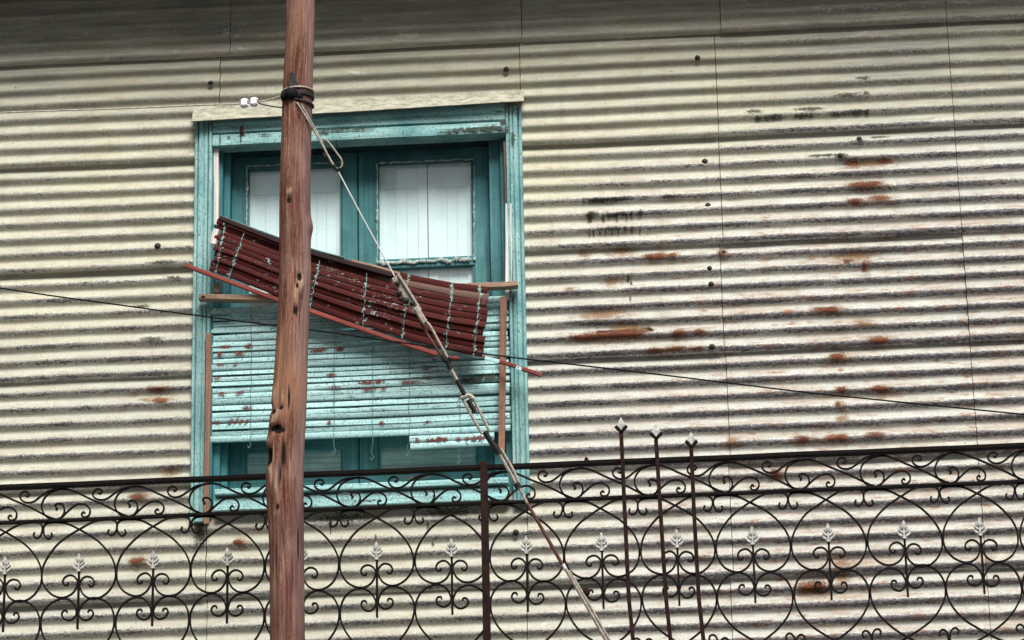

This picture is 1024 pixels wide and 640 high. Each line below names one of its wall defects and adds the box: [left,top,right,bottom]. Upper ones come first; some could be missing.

rust [845,158,902,168]
rust [846,181,893,207]
rust [570,308,708,358]
rust [132,386,173,402]
peeling [211,343,253,426]
peeling [358,379,422,392]
rust [796,434,851,445]
rust [795,560,851,597]